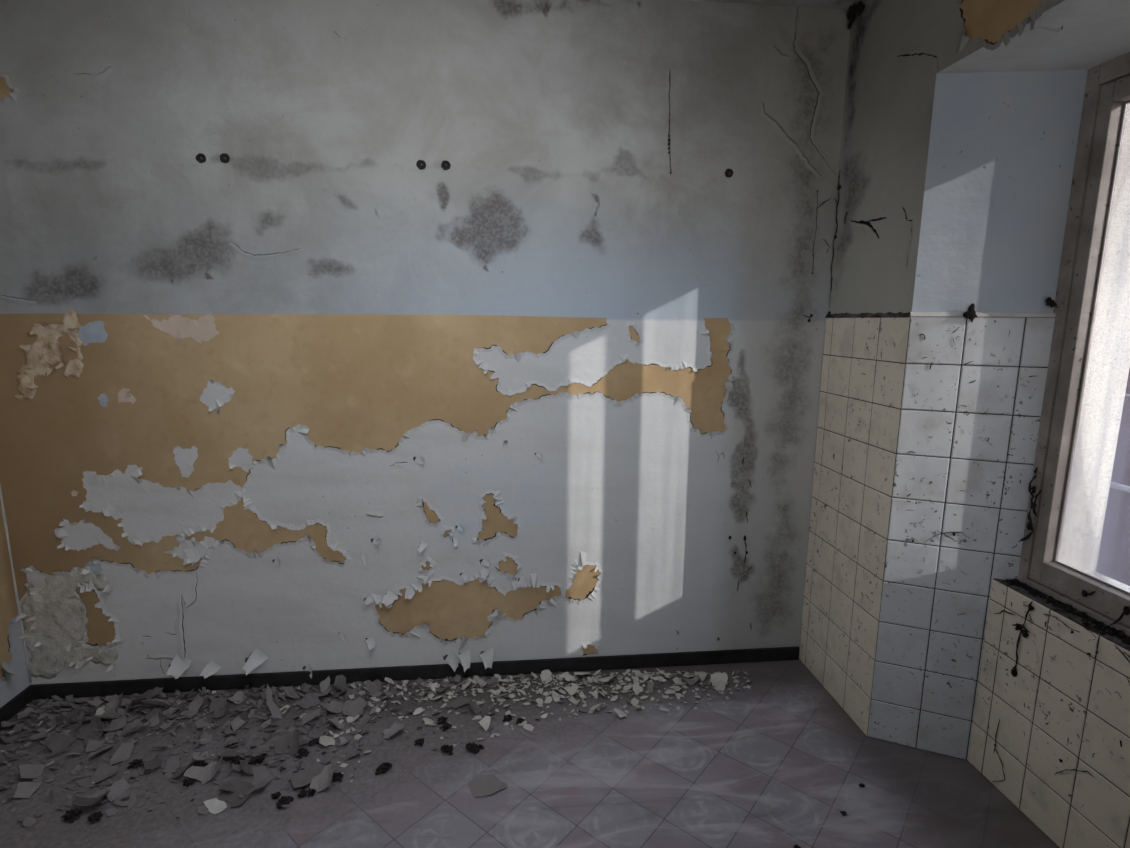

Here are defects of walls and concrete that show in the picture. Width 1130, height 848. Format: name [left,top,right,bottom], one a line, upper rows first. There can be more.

peeling [956,0,1064,55]
mould [438,185,449,209]
mould [452,194,519,271]
peeling [0,313,735,684]